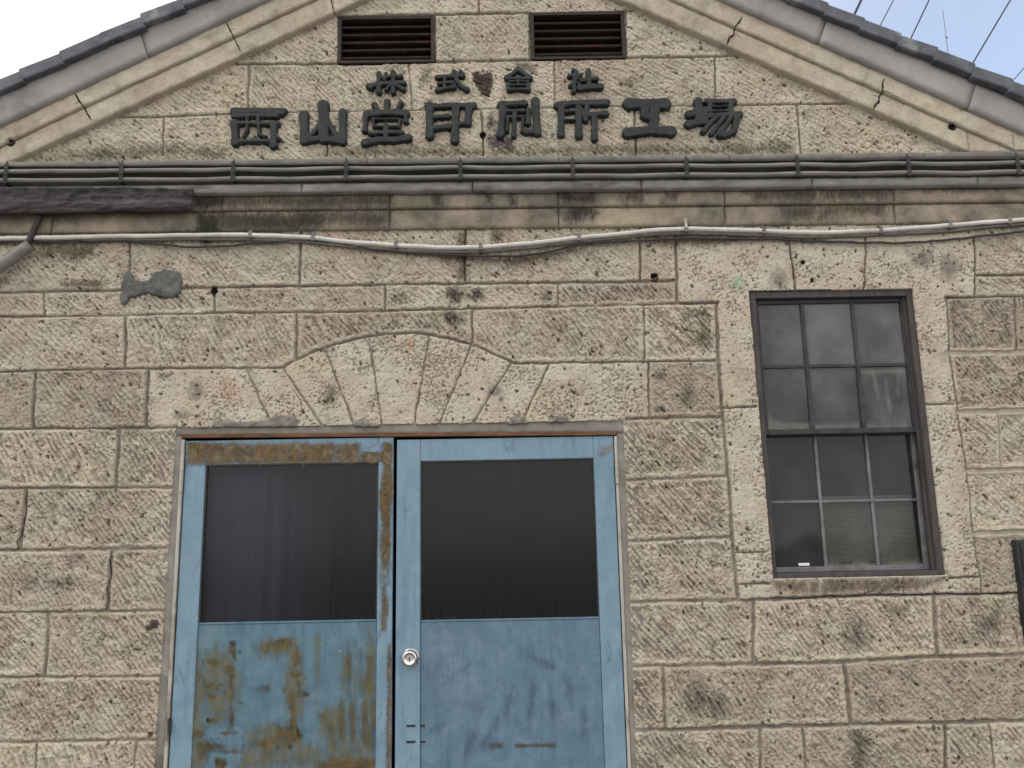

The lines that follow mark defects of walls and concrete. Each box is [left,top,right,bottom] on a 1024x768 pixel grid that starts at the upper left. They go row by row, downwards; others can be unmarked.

crack [727,16,743,44]
crack [75,94,91,120]
crack [873,78,898,110]
corrosion [186,442,393,630]
corrosion [192,639,392,768]